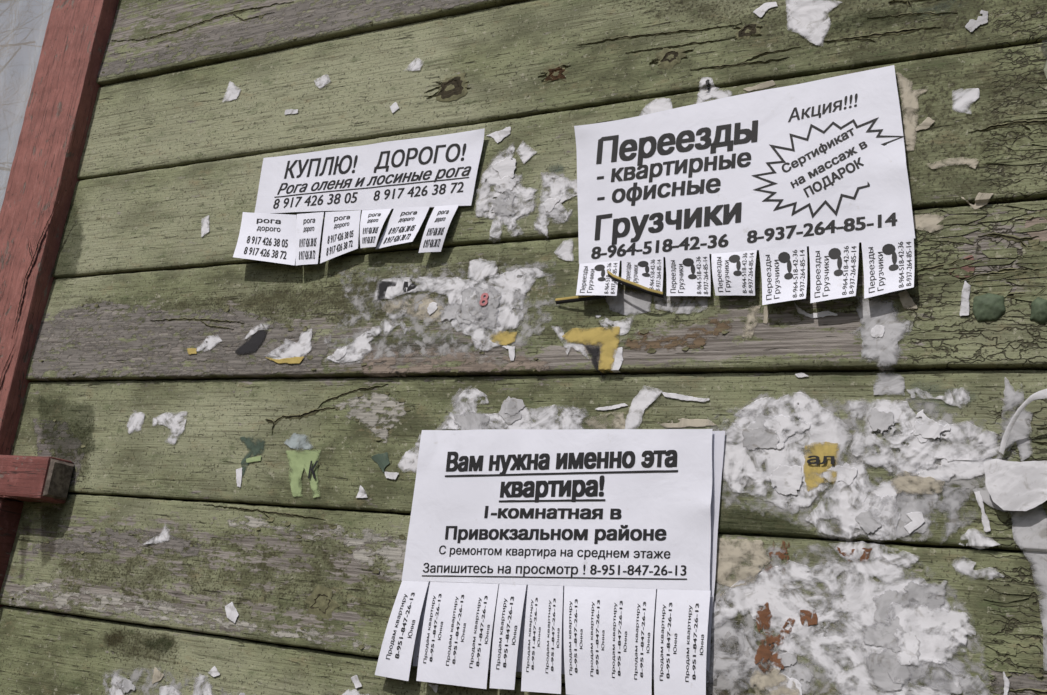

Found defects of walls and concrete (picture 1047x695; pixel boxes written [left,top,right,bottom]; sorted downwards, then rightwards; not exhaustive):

crack [112,1,294,41]
peeling [97,0,487,78]
crack [918,204,1047,302]
crack [265,384,386,433]